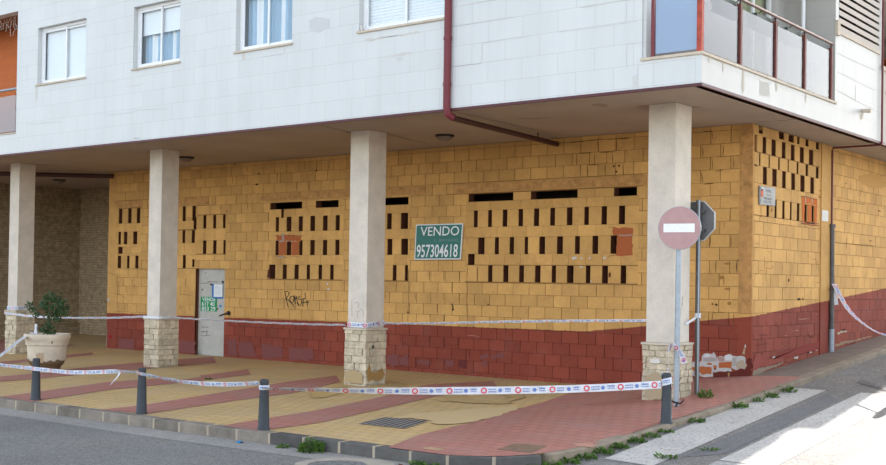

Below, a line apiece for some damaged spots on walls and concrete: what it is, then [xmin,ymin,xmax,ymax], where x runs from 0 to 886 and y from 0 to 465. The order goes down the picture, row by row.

peeling [692,345,747,377]